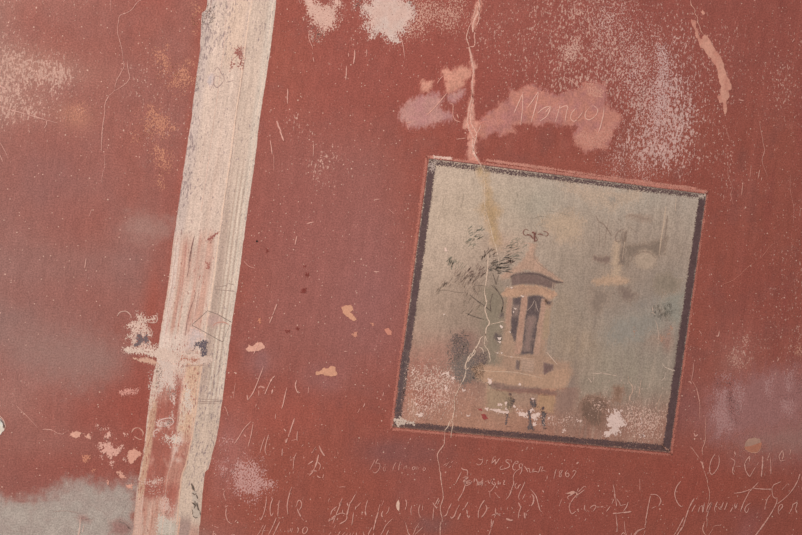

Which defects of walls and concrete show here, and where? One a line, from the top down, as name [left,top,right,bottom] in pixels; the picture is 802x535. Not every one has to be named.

peeling [300,0,470,48]
peeling [398,79,465,129]
peeling [477,0,701,187]
crack [405,0,504,535]
peeling [341,305,356,321]
peeling [246,342,265,352]
peeling [316,366,337,376]
peeling [401,363,466,424]
peeling [485,398,663,446]